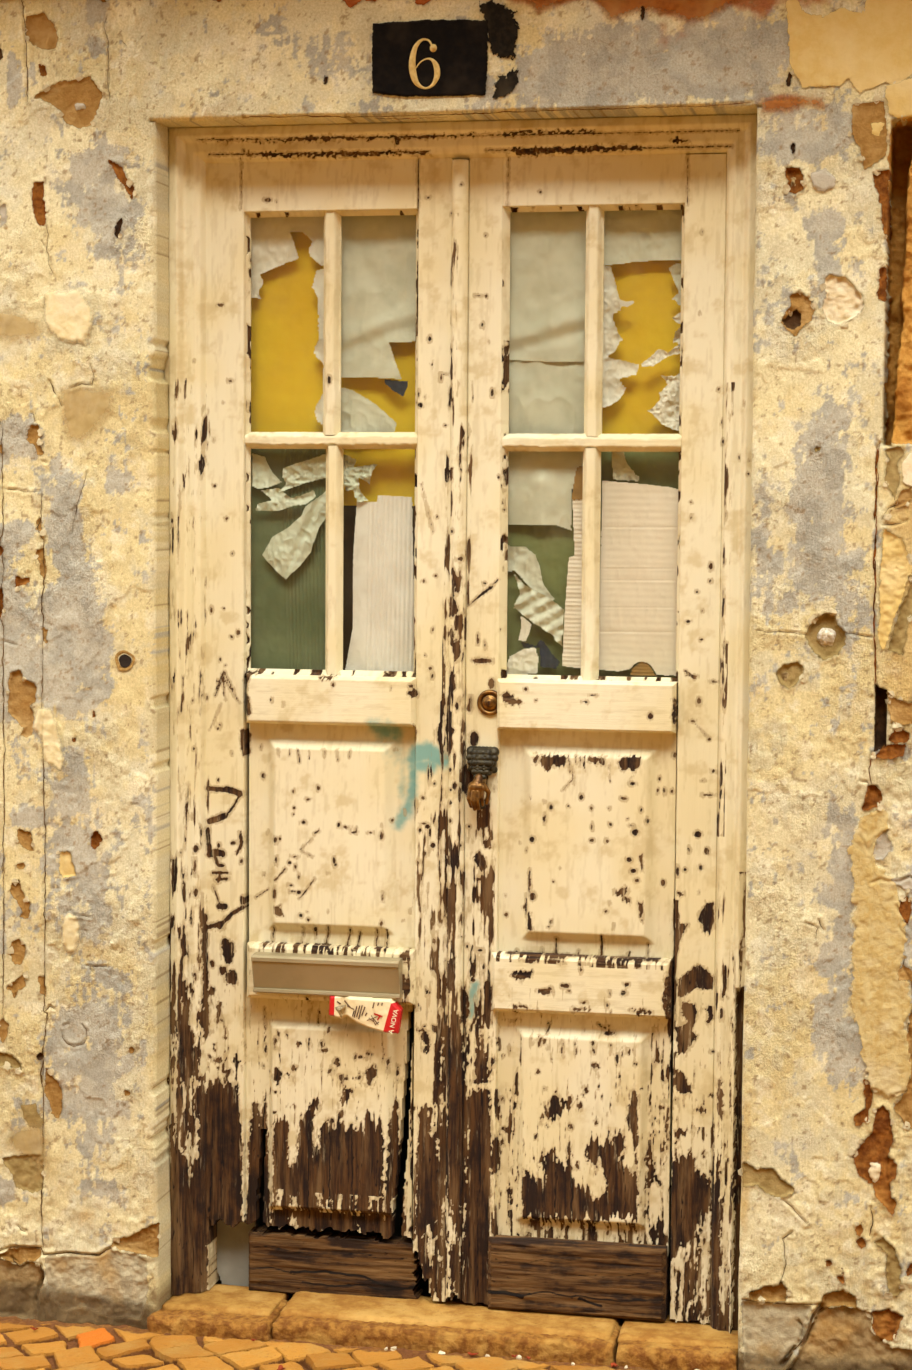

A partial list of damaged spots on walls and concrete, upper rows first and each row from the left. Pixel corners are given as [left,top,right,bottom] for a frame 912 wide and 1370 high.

flaking render [22,13,102,129]
flaking render [29,182,48,226]
flaking render [108,160,137,199]
crack [846,444,906,681]
flaking render [6,670,37,738]
flaking render [870,684,912,760]
flaking render [9,829,35,919]
flaking render [846,785,912,1215]
flaking render [36,1052,62,1118]
flaking render [738,1160,794,1198]
flaking render [739,1222,912,1366]